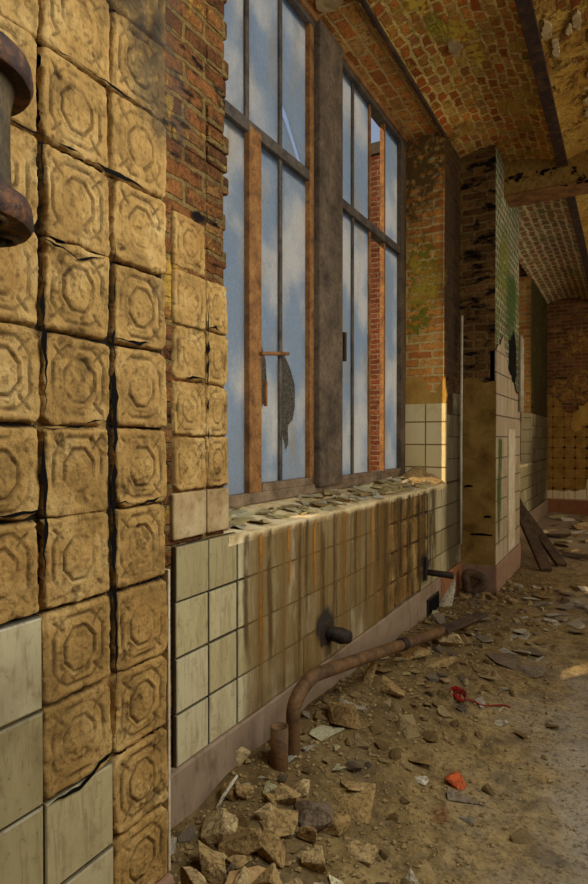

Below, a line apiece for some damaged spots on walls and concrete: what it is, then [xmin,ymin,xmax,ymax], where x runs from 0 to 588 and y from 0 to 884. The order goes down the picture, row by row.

peeling [541,9,582,58]
crack [0,219,163,805]
crack [186,295,227,487]
spalling [0,0,430,884]
spalling [547,371,588,492]